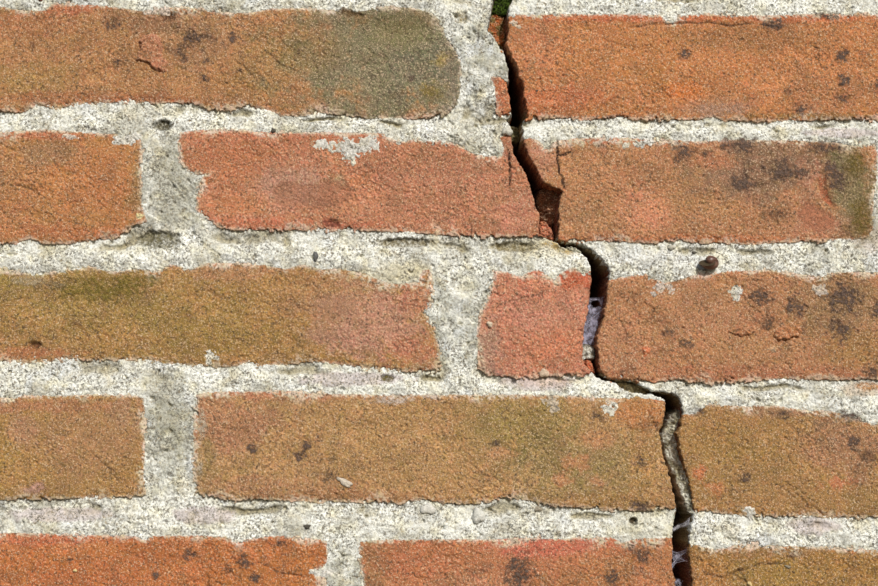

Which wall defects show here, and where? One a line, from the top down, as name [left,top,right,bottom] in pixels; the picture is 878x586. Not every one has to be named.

crack [478,0,711,586]